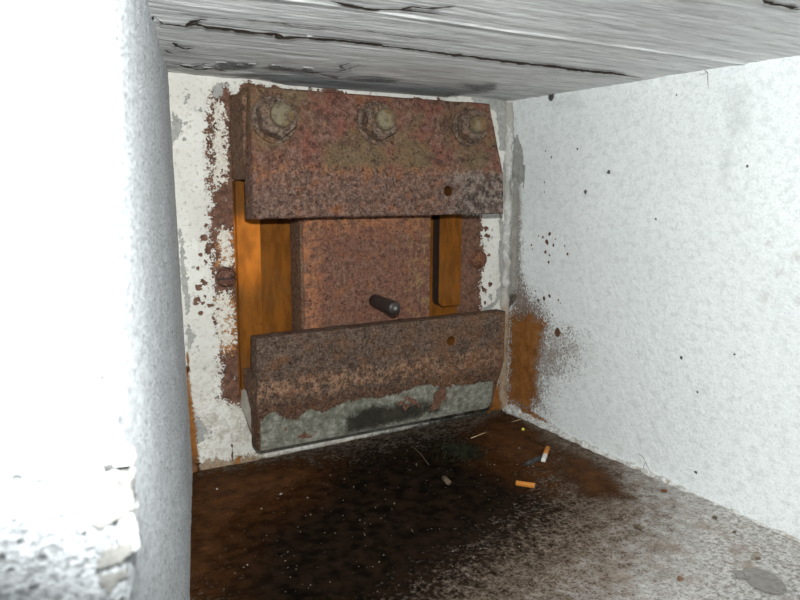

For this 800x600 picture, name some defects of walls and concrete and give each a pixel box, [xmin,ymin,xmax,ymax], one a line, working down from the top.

crack [329,0,454,16]
crack [762,0,800,10]
crack [151,11,643,79]
peeling [171,111,188,146]
peeling [178,80,298,411]
damp [529,317,586,413]
peeling [195,416,213,444]
damp [379,382,508,435]
rust [473,287,632,500]